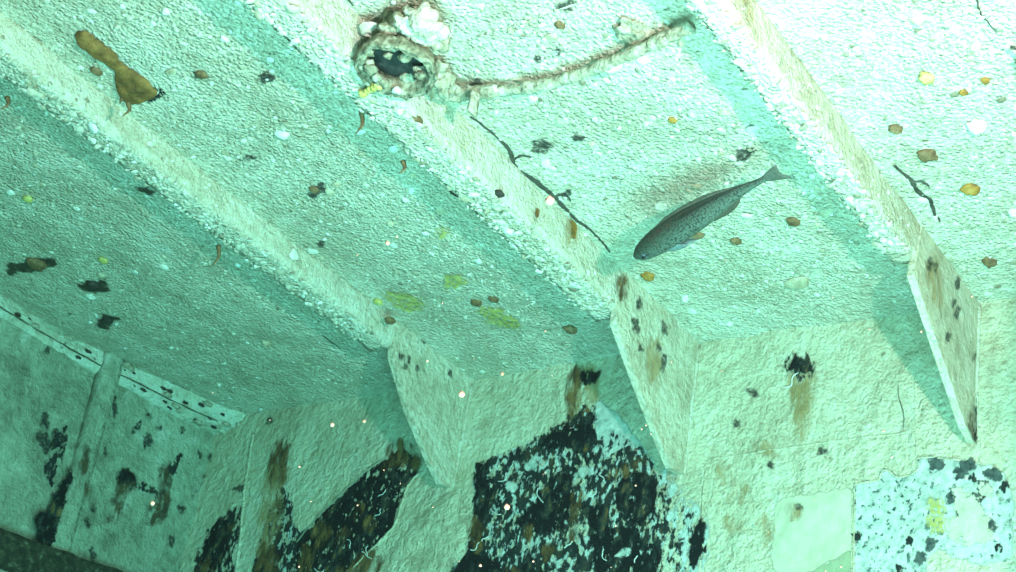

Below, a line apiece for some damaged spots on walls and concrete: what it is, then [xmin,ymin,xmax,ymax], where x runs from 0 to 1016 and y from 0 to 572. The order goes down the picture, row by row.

corrosion [75,31,166,104]
crack [469,116,610,253]
crack [894,164,941,222]
corrosion [782,353,814,437]
peeling [810,456,1015,572]